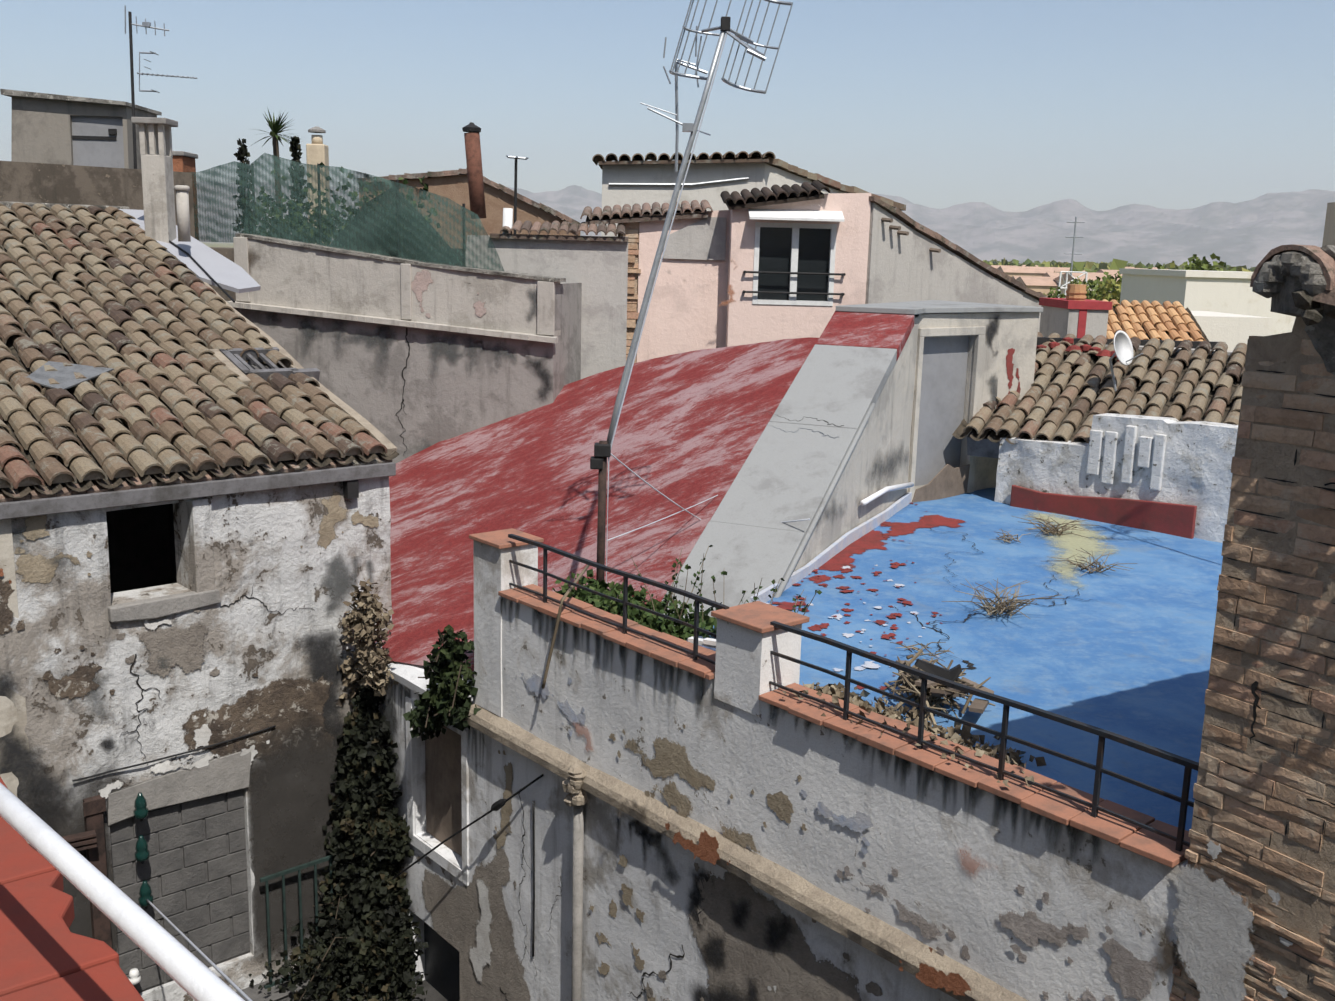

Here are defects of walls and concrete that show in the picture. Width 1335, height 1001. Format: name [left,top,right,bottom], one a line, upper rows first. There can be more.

crack [396,328,410,452]
peeling [767,503,965,694]
leakage [0,676,14,699]
crack [119,654,160,758]
peeling [150,670,348,774]
crack [1250,681,1261,744]
leakage [0,730,140,883]
leakage [56,869,92,938]
leakage [248,633,346,957]
crack [628,945,685,1001]
peeling [609,729,971,1001]
peeling [1170,840,1255,1001]